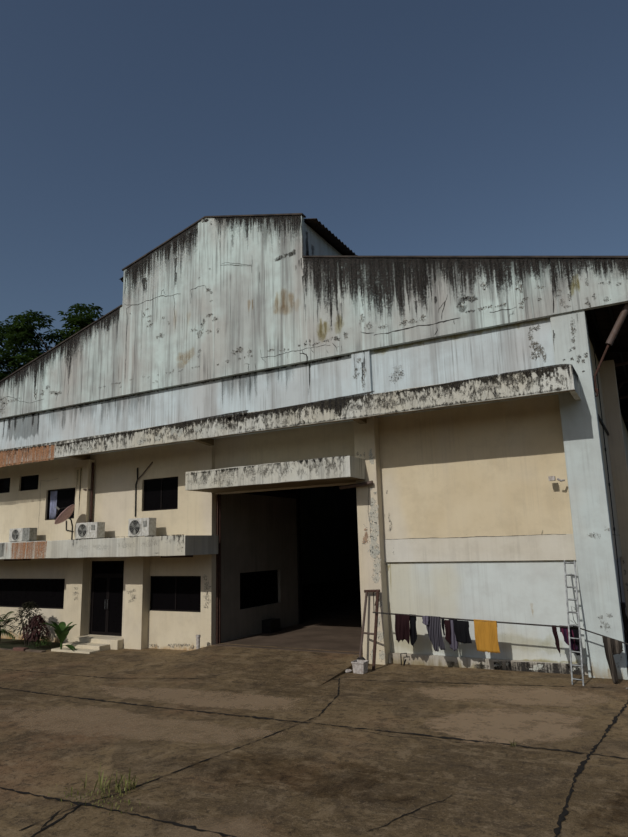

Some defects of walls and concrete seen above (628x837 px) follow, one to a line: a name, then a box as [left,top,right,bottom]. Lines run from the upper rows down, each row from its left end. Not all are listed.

leakage [125,223,198,291]
leakage [215,215,628,325]
leakage [0,308,120,391]
leakage [233,355,349,385]
crack [362,298,458,335]
leakage [0,364,579,462]
corrosion [0,445,54,467]
corrosion [11,541,47,559]